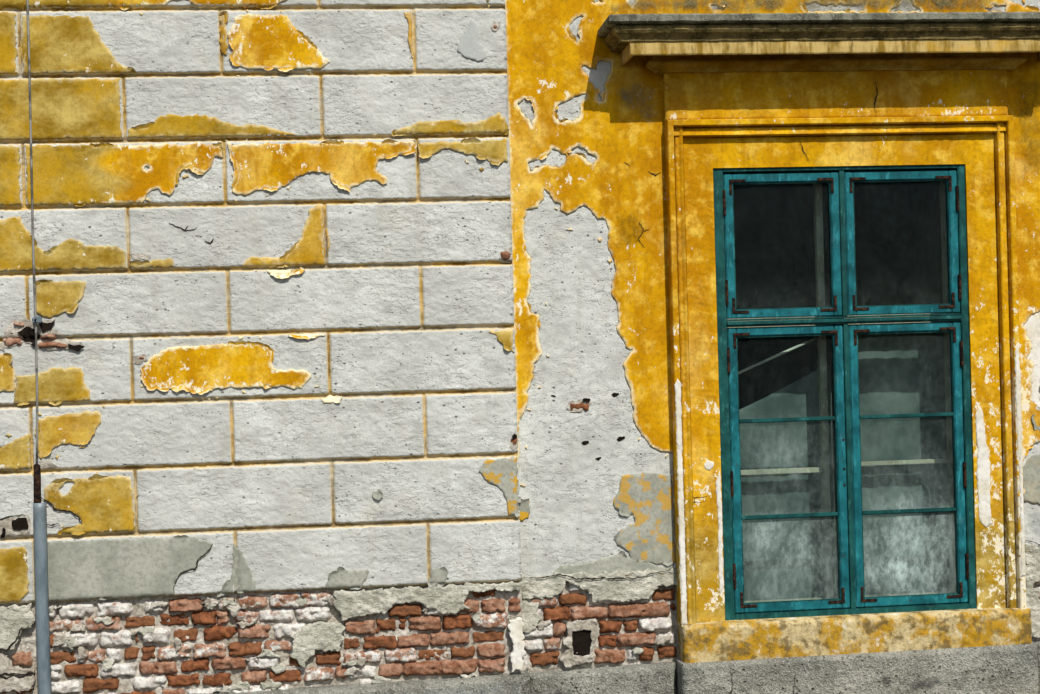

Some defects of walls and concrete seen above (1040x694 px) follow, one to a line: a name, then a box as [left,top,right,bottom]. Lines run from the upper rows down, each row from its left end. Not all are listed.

peeling [566,16,584,43]
peeling [985,0,1040,12]
peeling [518,98,535,126]
peeling [554,58,611,123]
peeling [528,146,597,172]
peeling [0,0,509,535]
flaking render [49,189,688,694]
flaking render [1014,312,1040,641]
flaking render [0,515,38,694]